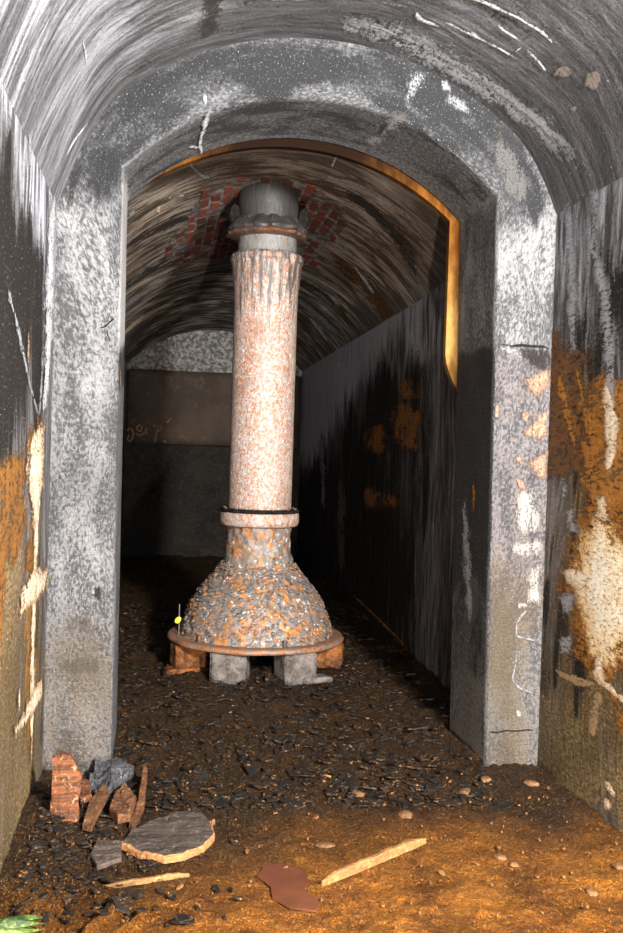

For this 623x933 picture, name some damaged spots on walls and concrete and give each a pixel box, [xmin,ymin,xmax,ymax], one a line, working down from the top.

leakage [198,0,223,37]
crack [188,95,211,179]
spalling [165,178,348,271]
rust [0,412,40,647]
rust [24,602,38,753]
leakage [7,189,57,760]
rust [547,324,623,736]
efflorescence [555,495,623,737]